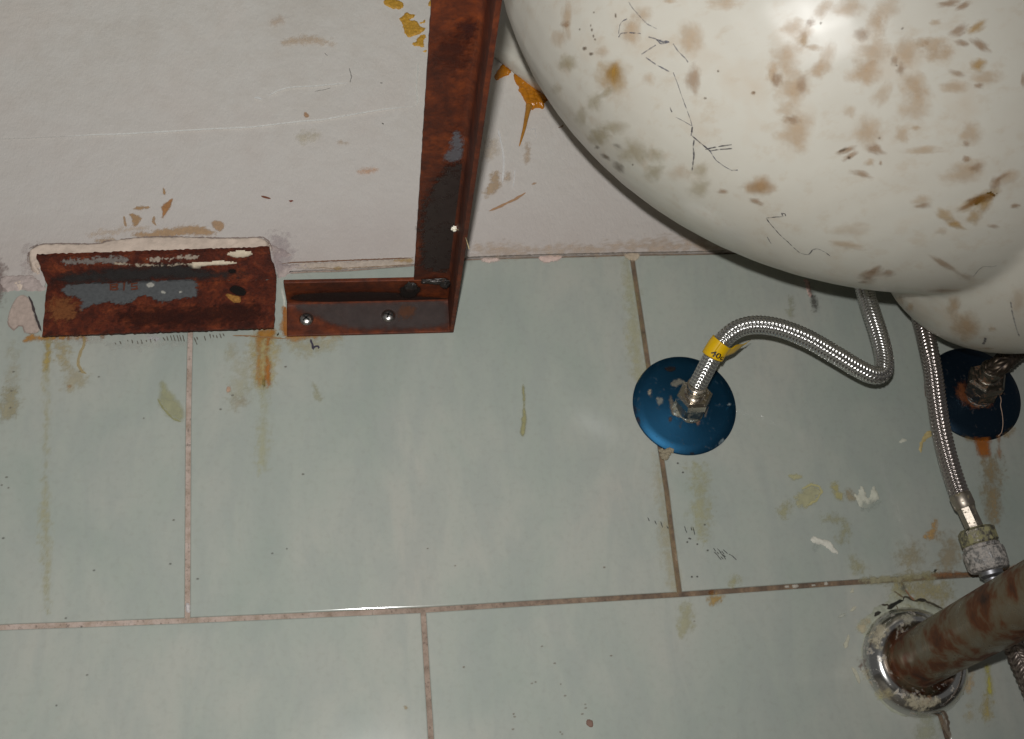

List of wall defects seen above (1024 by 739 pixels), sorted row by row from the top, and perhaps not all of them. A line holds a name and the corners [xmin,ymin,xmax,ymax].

spalling [7,295,41,334]
corrosion [24,334,87,368]
corrosion [233,307,317,385]
crack [874,590,943,616]